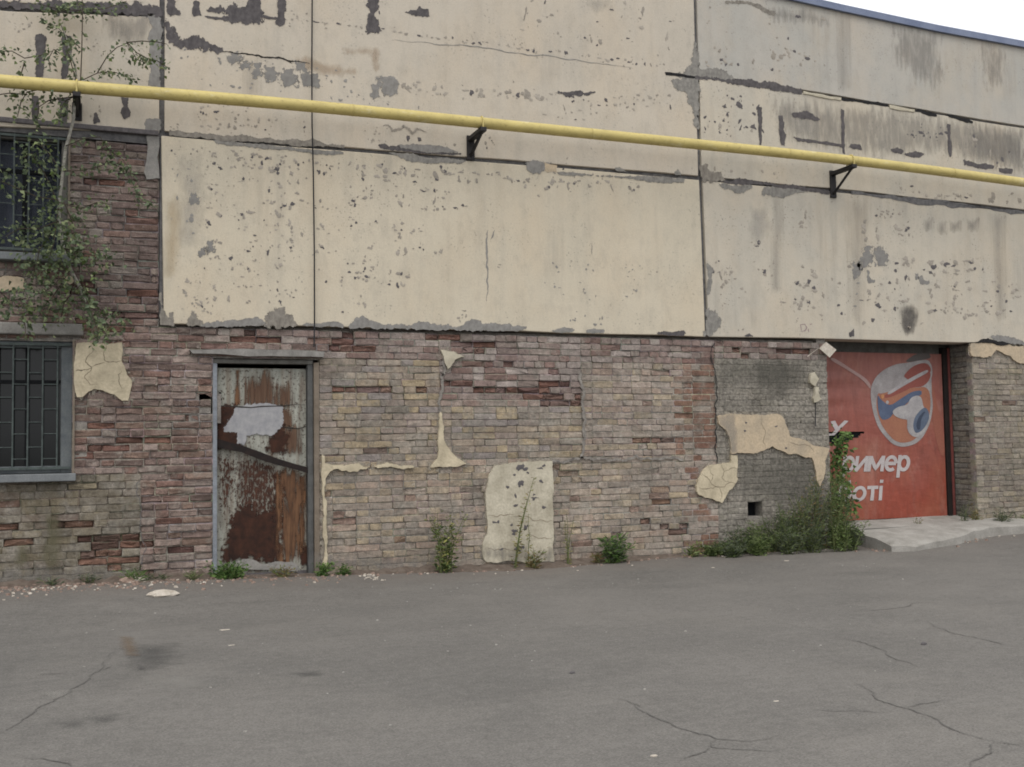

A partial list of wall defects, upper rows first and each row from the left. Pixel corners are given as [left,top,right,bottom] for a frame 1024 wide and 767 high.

peeling [0,0,568,109]
peeling [462,20,825,145]
spalling [112,105,685,354]
peeling [780,265,824,323]
peeling [837,185,1024,337]
rust [217,369,307,566]
peeling [506,464,546,509]